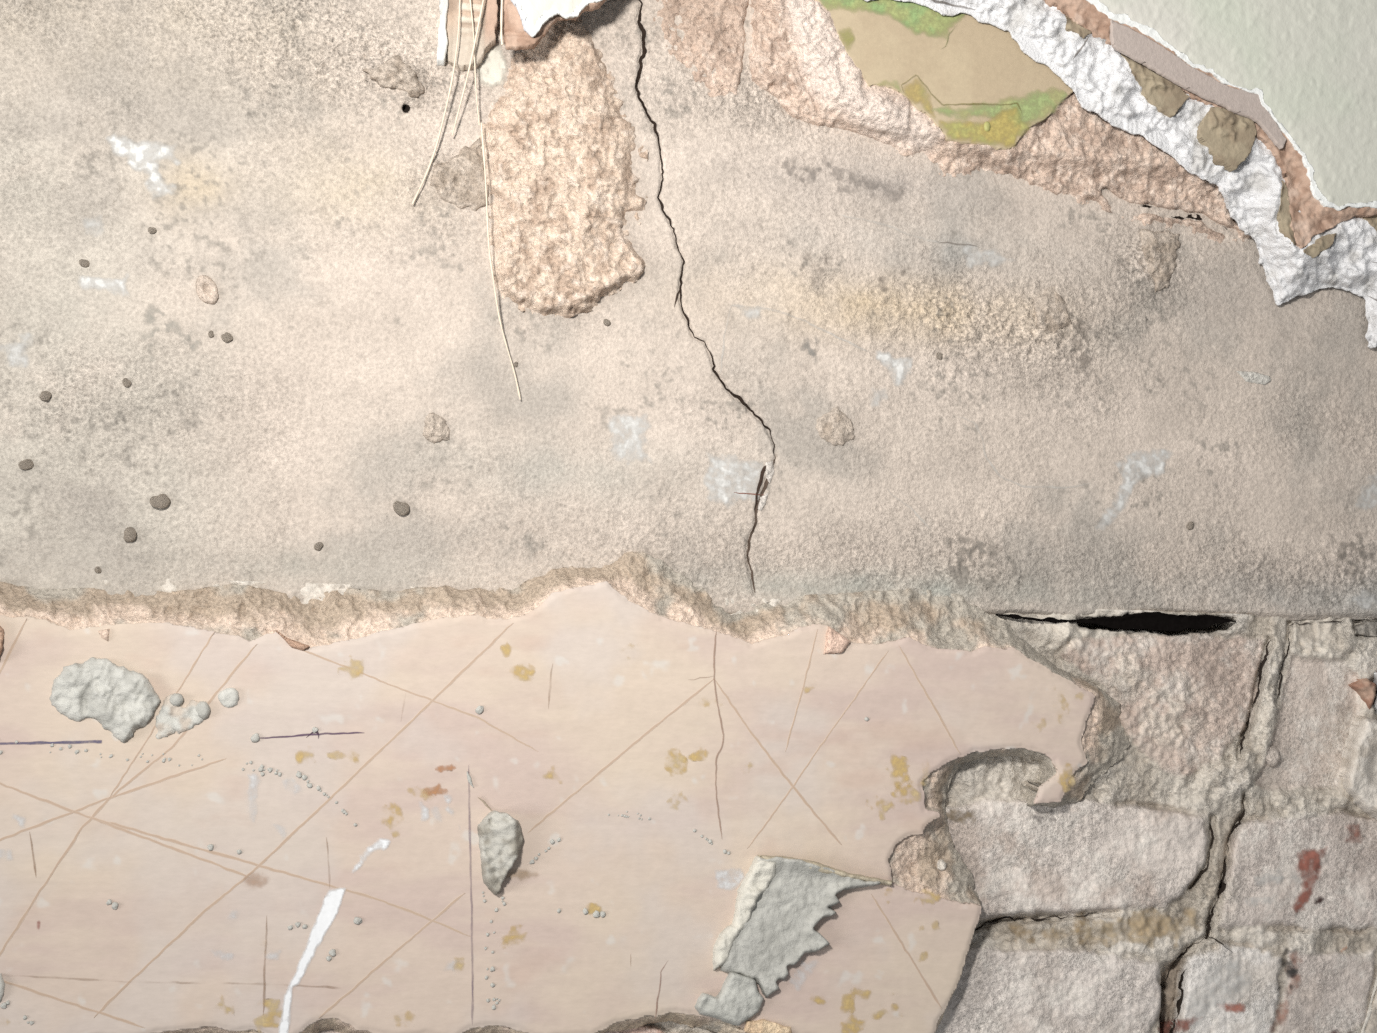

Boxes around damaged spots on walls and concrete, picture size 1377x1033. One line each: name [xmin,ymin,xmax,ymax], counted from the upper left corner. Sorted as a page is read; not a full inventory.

peeling [822,0,965,48]
peeling [902,81,1066,146]
crack [635,0,776,592]
spalling [0,551,1131,907]
spalling [301,1018,371,1033]
spalling [463,1025,525,1033]
spalling [597,1012,792,1033]